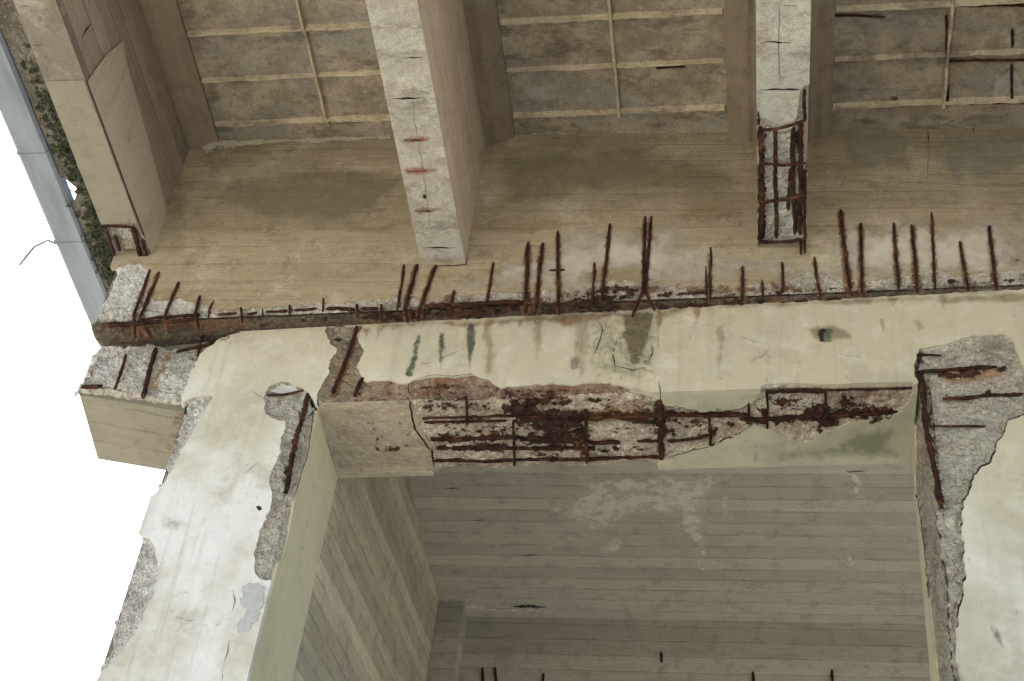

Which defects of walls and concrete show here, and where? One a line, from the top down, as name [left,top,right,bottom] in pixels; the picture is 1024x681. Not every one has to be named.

damp [467,322,491,371]
rust [91,274,1024,346]
damp [623,310,675,364]
spalling [74,209,1024,681]